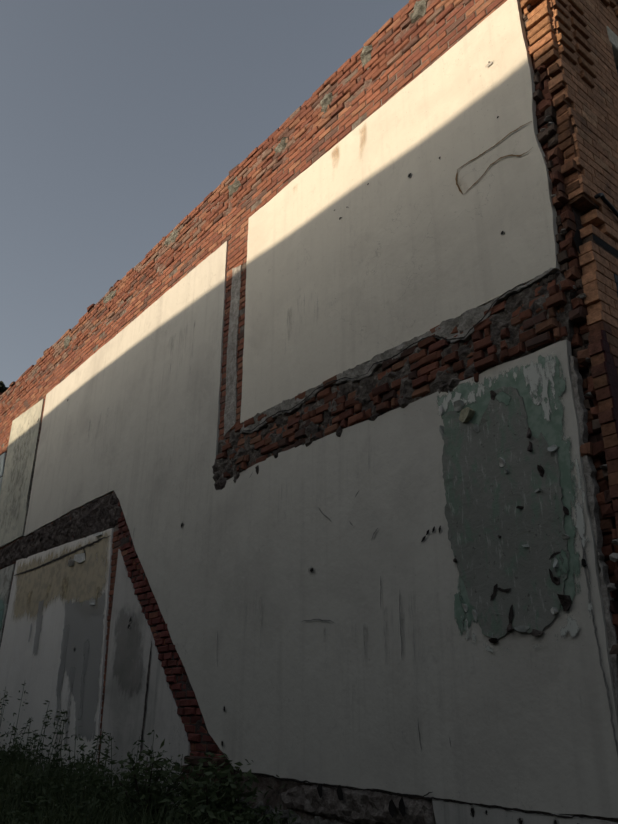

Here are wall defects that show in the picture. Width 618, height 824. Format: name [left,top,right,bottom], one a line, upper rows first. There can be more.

crack [455,121,533,194]
peeling [212,268,618,756]
water stain [14,534,108,744]
crack [235,771,618,821]